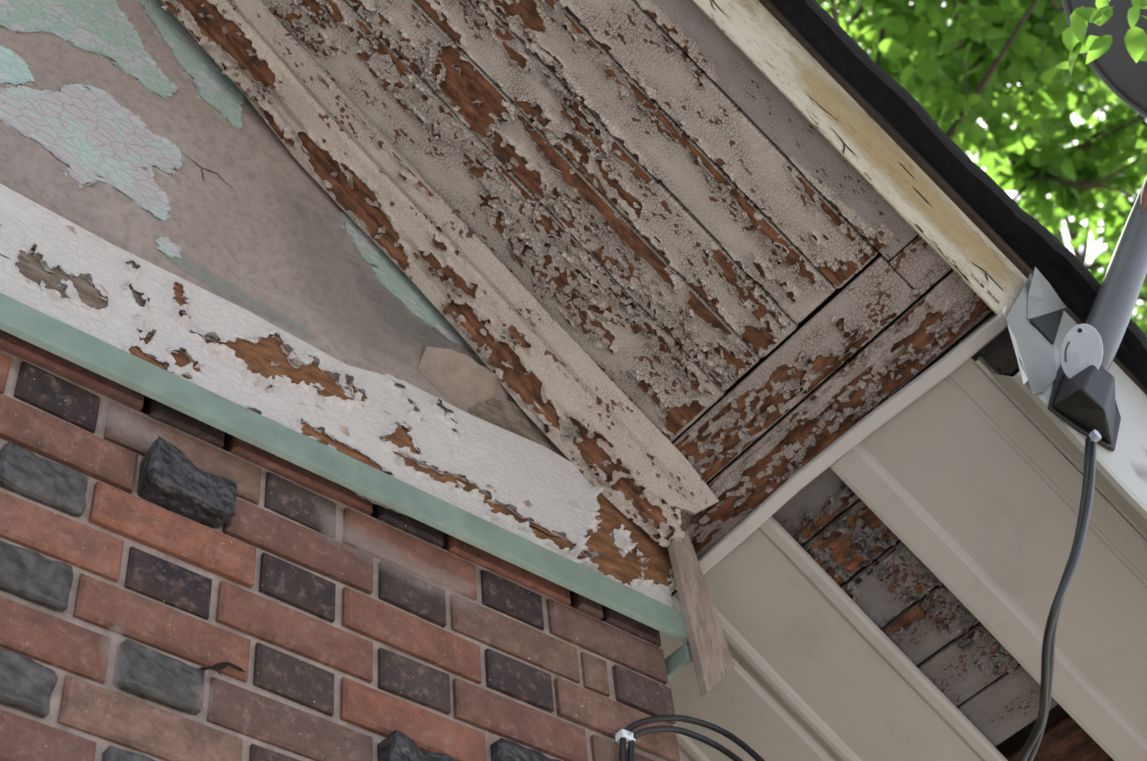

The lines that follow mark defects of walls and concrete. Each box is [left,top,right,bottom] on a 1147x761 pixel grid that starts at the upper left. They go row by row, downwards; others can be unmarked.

peeling [0,0,178,101]
peeling [0,44,184,259]
peeling [3,242,376,413]
peeling [136,0,1000,595]
peeling [789,481,1019,678]